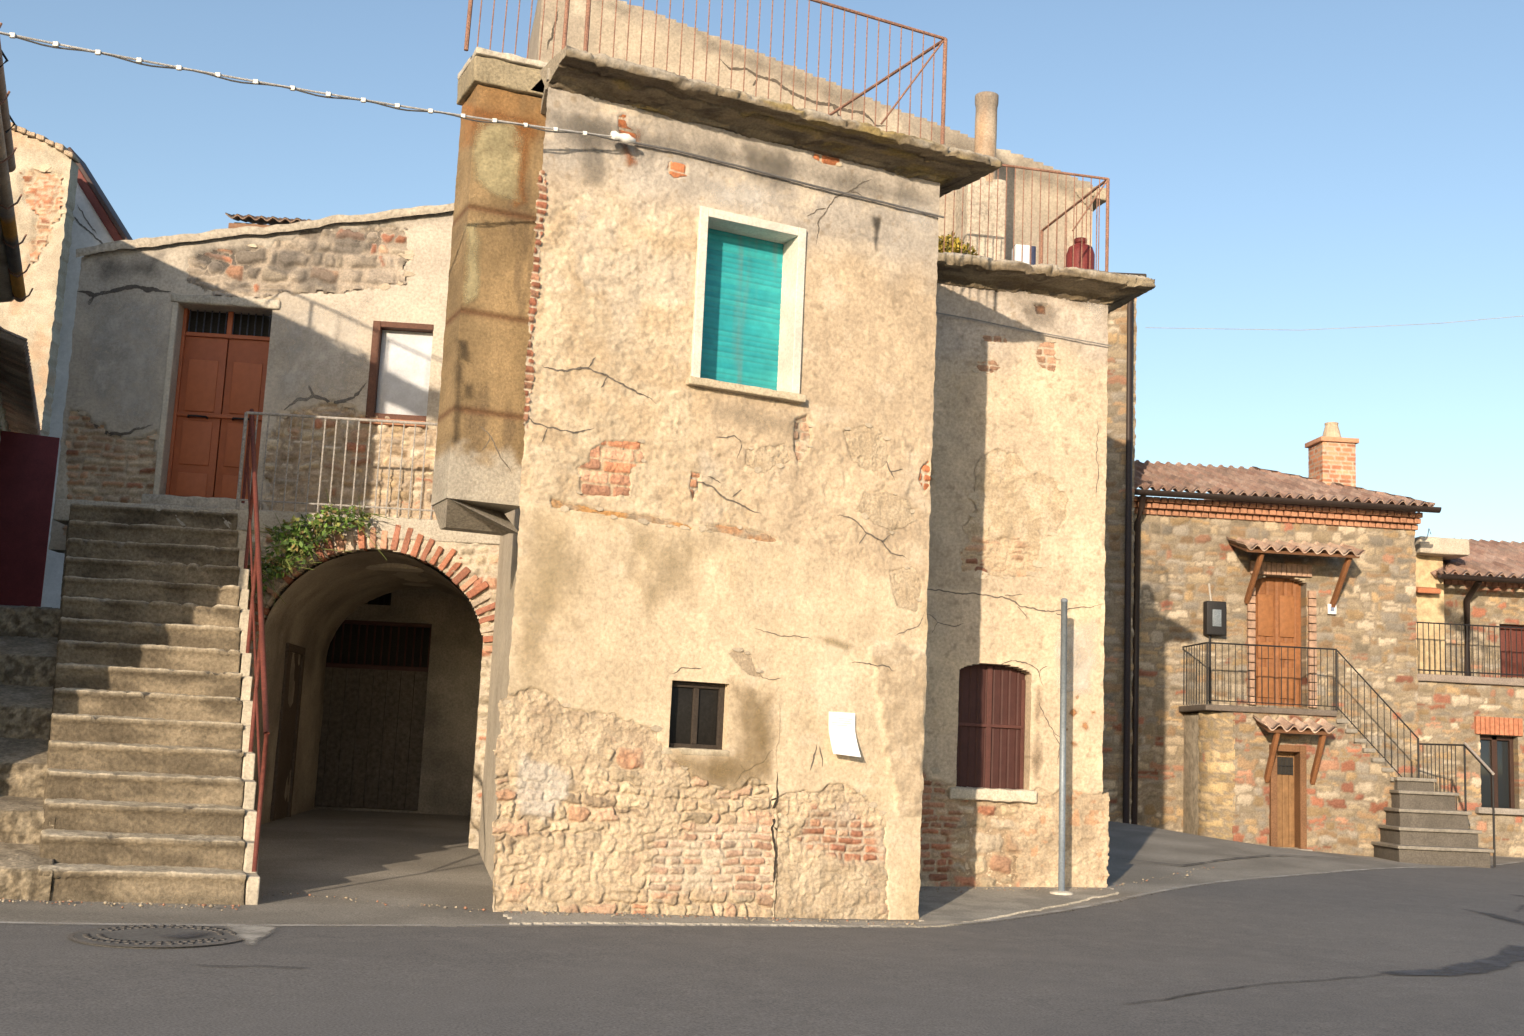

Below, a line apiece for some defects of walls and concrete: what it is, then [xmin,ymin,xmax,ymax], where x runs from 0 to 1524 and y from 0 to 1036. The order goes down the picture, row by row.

crack [720,59,888,127]
flaking render [11,122,80,264]
spalling [187,224,416,300]
flaking render [475,123,547,428]
crack [808,179,872,244]
flaking render [551,439,776,543]
crack [697,435,759,513]
crack [838,515,907,559]
spalling [960,449,1068,579]
spalling [492,688,889,919]
crack [734,673,823,883]
spalling [920,760,1110,887]